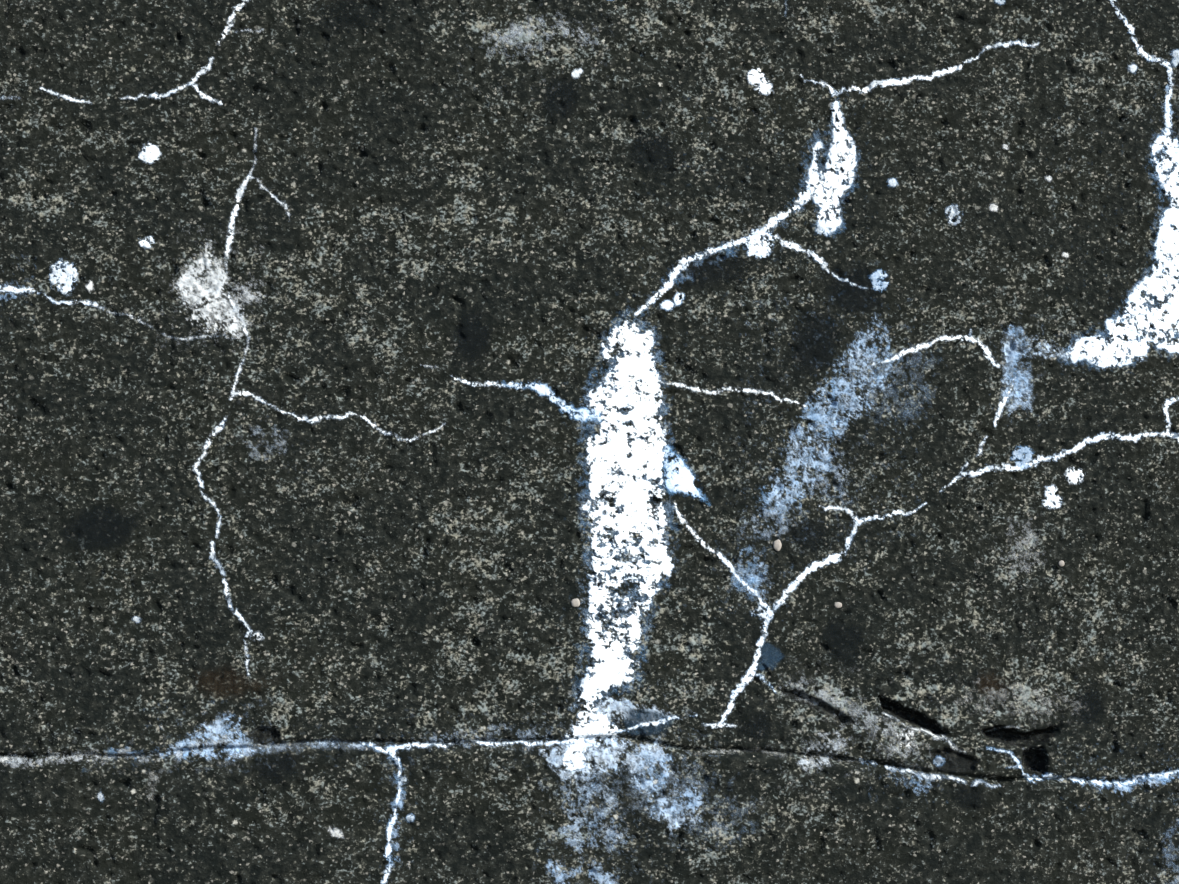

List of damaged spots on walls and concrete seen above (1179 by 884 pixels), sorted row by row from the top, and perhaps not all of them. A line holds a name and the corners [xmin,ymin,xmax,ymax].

crack [40,87,91,103]
crack [0,286,143,324]
crack [123,0,248,105]
crack [225,175,289,265]
crack [635,40,1038,315]
crack [1066,0,1179,368]
crack [193,296,443,675]
water stain [540,320,705,828]
crack [319,335,1179,884]